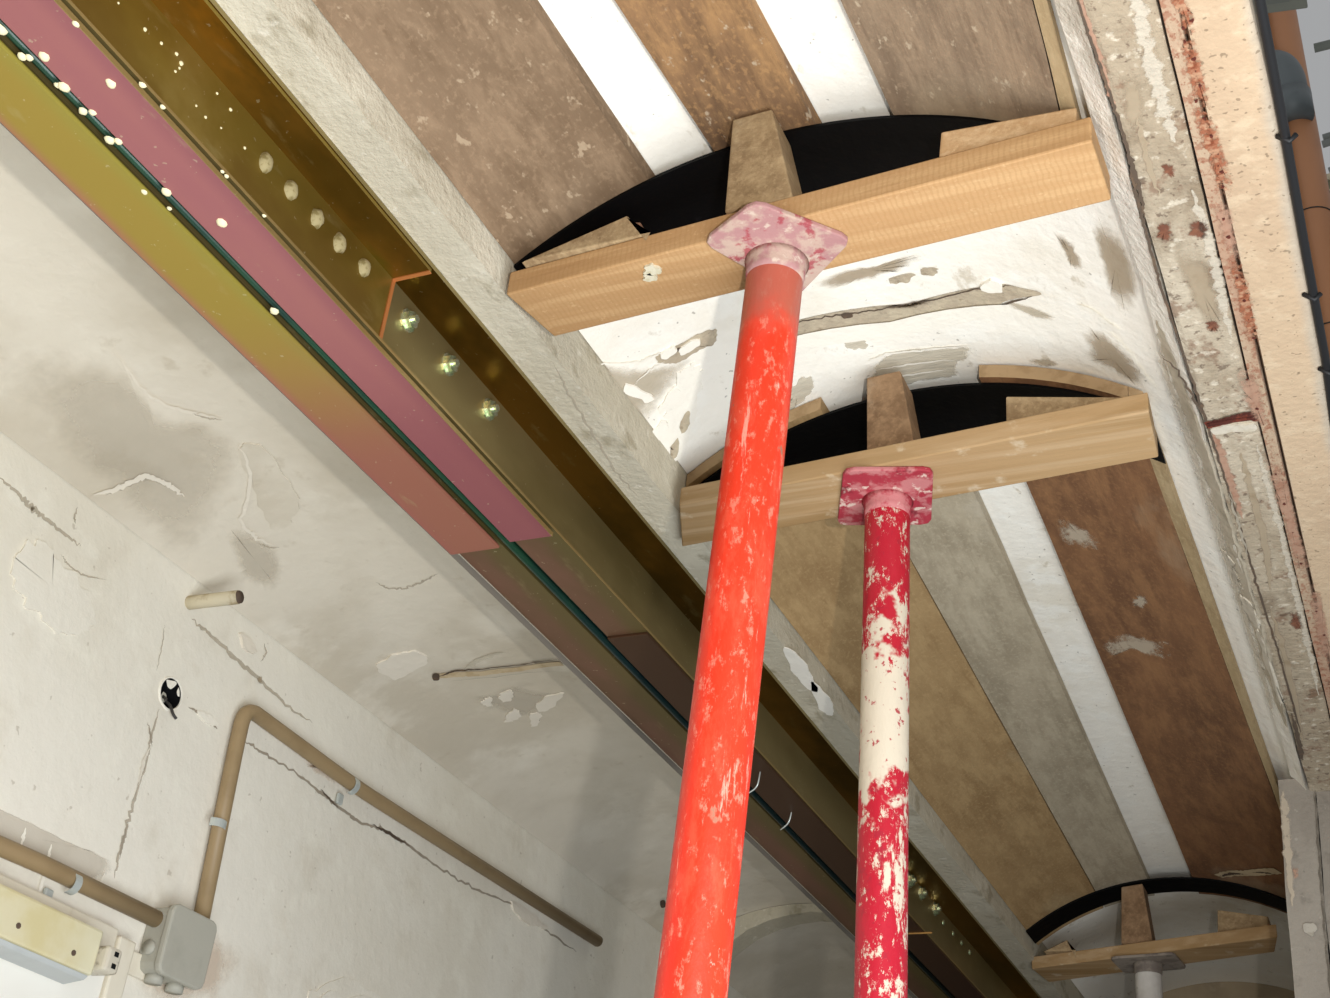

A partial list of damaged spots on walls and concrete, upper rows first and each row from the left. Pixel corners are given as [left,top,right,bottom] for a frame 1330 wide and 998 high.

peeling [623,361,703,461]
peeling [790,377,813,410]
peeling [845,341,968,384]
crack [796,278,1041,348]
crack [0,478,105,580]
peeling [94,473,184,496]
crack [157,619,311,721]
peeling [480,689,564,727]
crack [114,707,219,878]
crack [246,743,573,949]